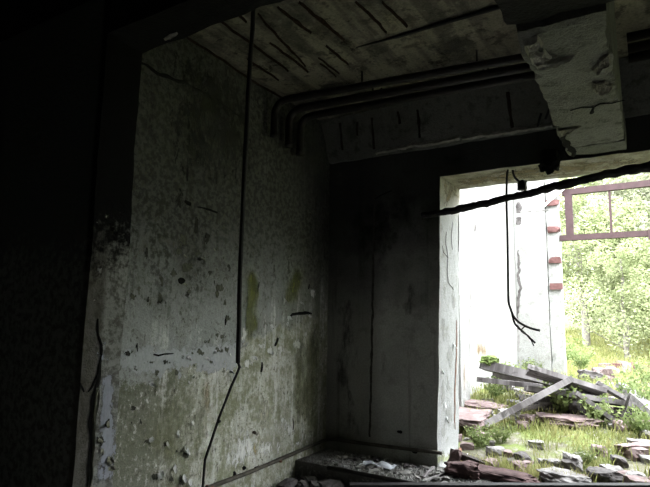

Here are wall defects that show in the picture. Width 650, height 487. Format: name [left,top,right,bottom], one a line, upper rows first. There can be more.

crack [570,100,625,114]
spalling [592,53,613,96]
crack [80,319,103,487]
peeling [97,374,116,481]
peeling [120,328,263,386]
crack [368,190,392,437]
crack [442,169,560,429]